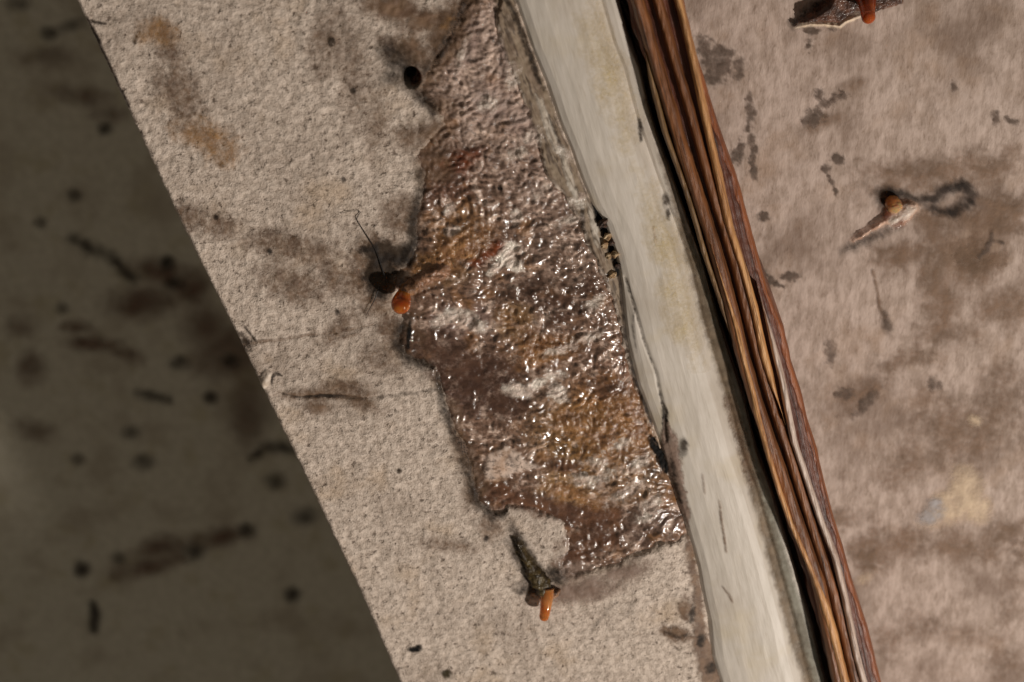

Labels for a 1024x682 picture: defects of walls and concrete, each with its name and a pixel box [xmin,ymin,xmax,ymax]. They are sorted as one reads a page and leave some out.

leakage [363,0,464,68]
leakage [671,441,688,503]